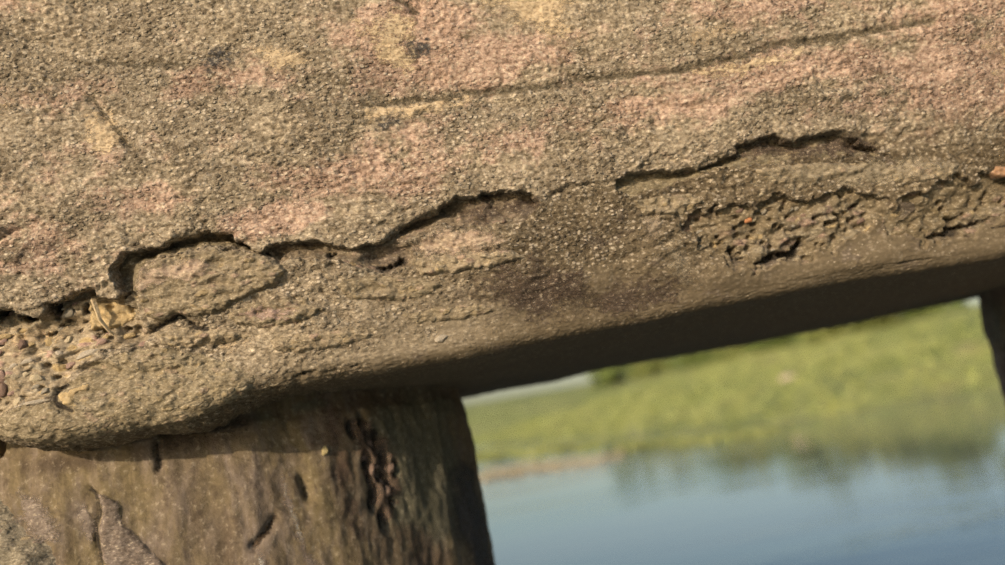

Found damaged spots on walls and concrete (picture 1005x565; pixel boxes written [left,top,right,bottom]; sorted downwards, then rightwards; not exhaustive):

spalling [615,135,1005,249]
spalling [0,192,536,415]
spalling [758,241,802,263]
crack [89,487,103,565]